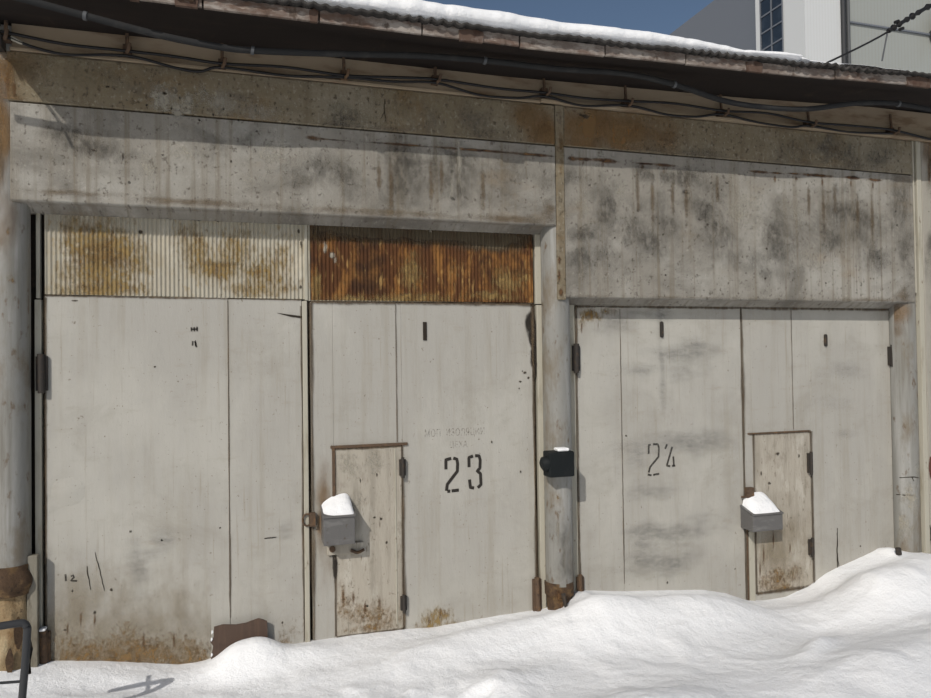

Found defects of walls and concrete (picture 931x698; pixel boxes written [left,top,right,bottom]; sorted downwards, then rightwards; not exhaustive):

corrosion [59,217,148,295]
corrosion [178,227,296,297]
corrosion [310,225,533,303]
corrosion [53,625,207,664]
corrosion [339,592,391,632]